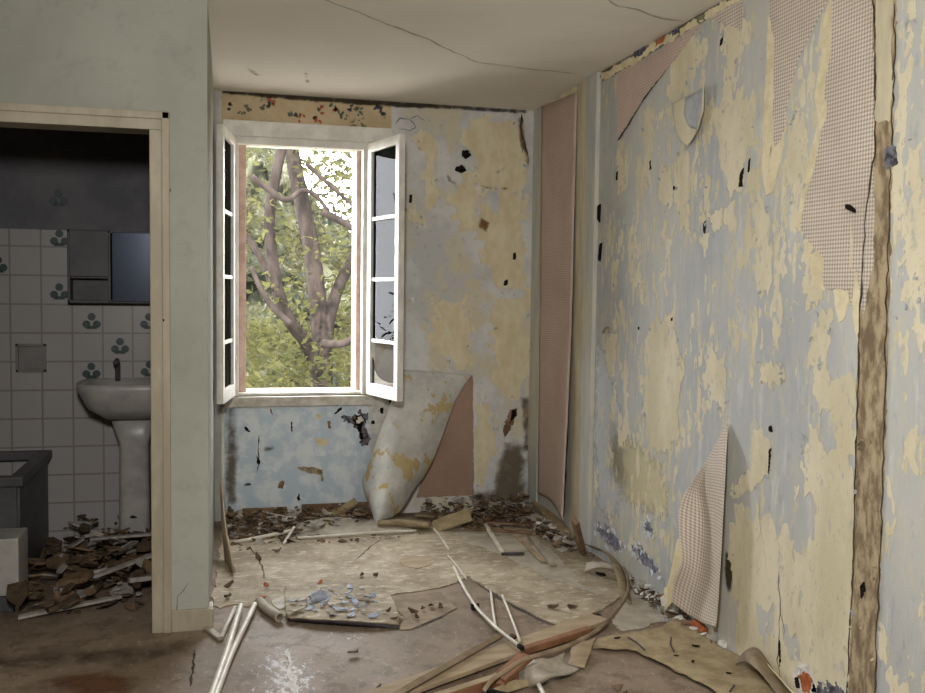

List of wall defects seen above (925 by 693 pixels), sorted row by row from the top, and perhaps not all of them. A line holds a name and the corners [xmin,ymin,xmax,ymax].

crack [326,0,576,74]
crack [608,0,681,21]
peeling [405,113,531,488]
peeling [593,0,925,693]
flaking render [315,400,392,447]
peeling [298,467,324,482]